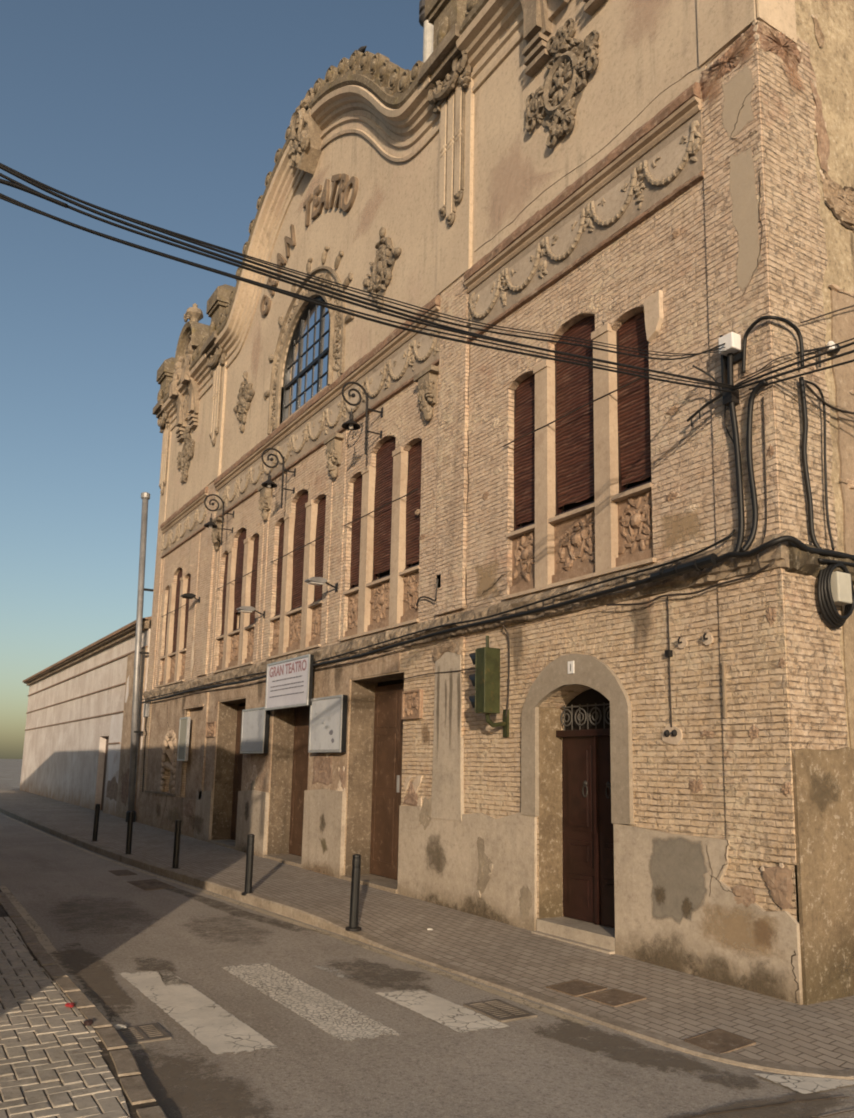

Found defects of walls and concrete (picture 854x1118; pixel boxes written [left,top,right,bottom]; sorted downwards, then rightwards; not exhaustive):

spalling [699,14,854,232]
peeling [476,837,493,898]
crack [707,840,740,897]
leakage [682,898,692,916]
leakage [706,907,772,953]
leakage [636,945,786,1000]